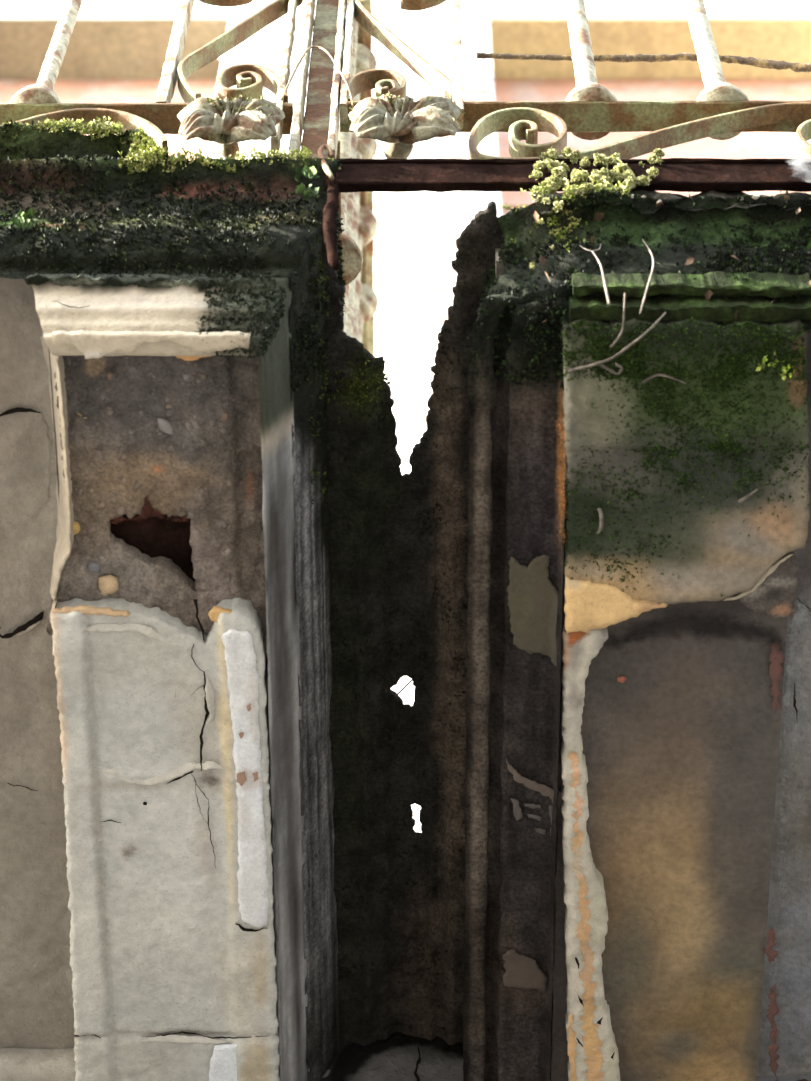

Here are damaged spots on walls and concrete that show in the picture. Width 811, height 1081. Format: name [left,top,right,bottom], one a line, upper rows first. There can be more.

crack [0,611,44,639]
spalling [46,330,269,929]
crack [191,599,216,868]
flaking render [503,554,667,1081]